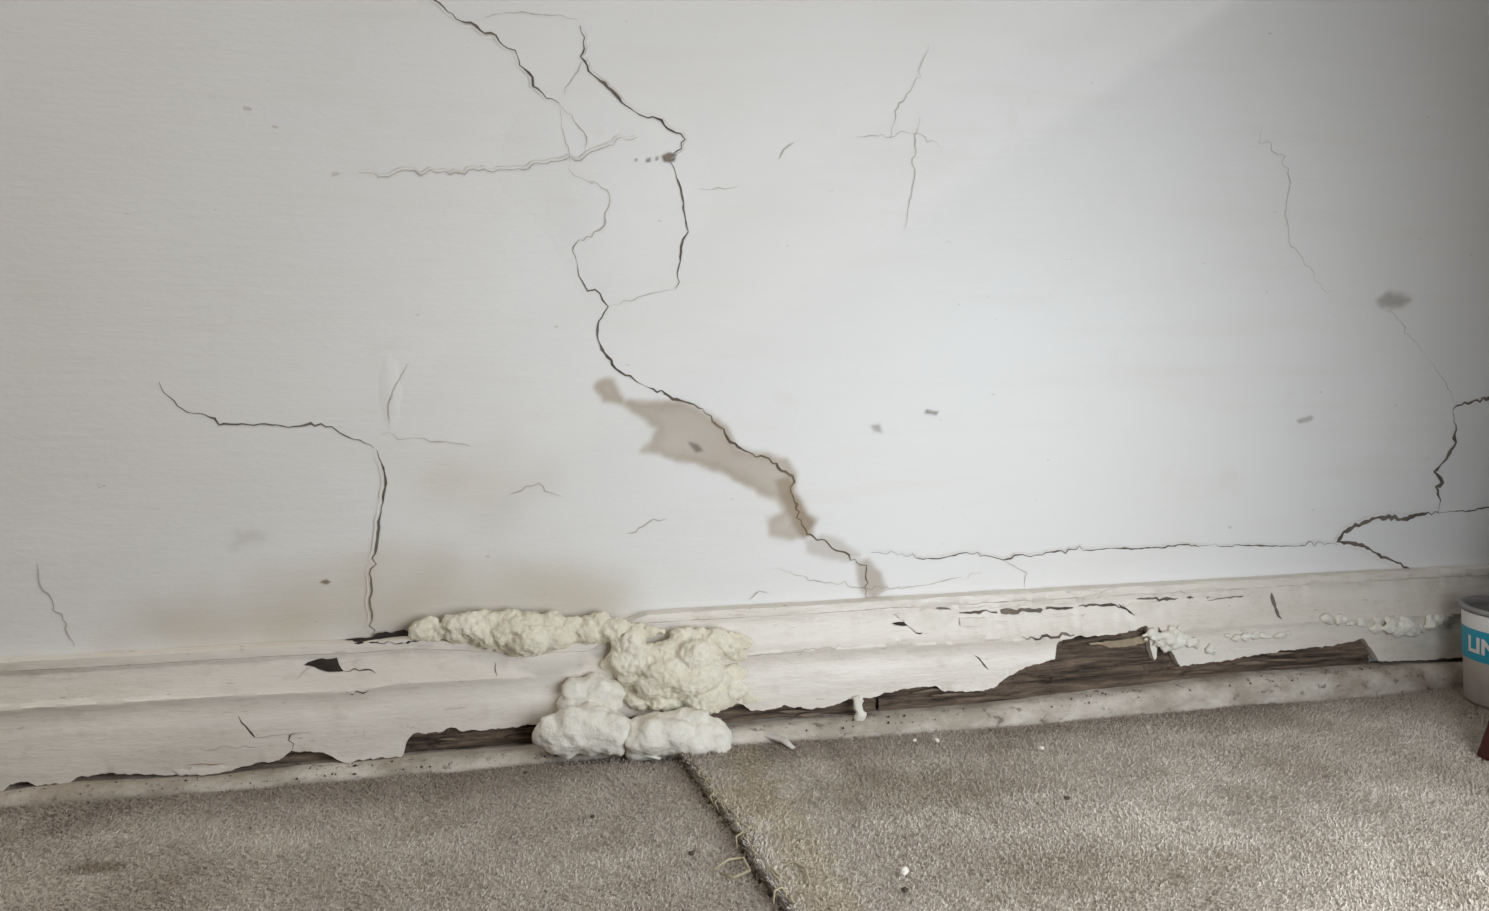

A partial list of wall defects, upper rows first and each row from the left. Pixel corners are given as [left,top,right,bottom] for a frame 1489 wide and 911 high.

crack [358,0,1489,641]
crack [159,363,469,634]
peeling [893,609,1006,634]
peeling [1087,635,1148,648]
peeling [173,763,228,776]